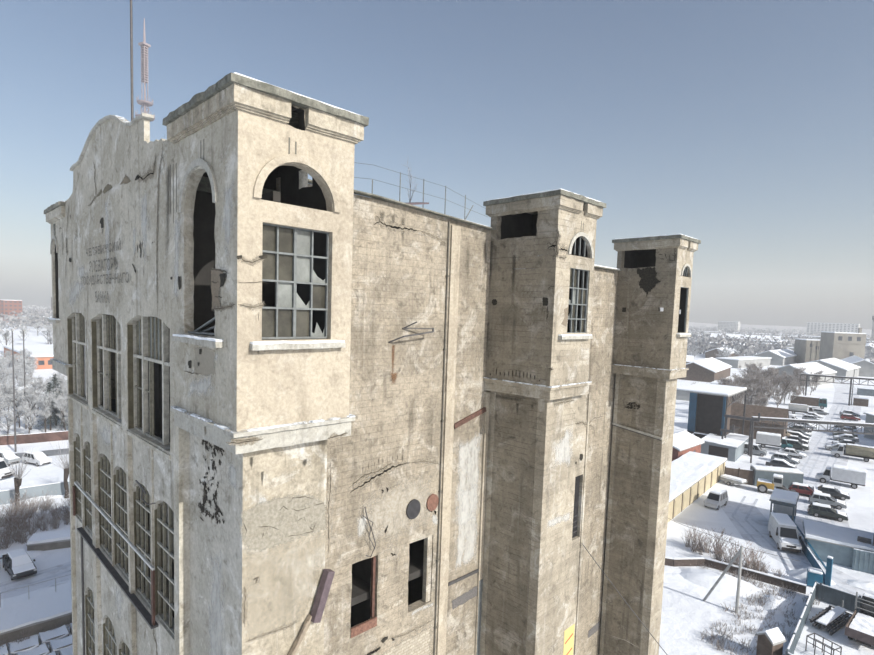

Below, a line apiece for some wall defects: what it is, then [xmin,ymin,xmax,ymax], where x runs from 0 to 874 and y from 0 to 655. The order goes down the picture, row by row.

crack [375,216,446,244]
spalling [211,268,227,310]
peeling [637,250,676,297]
peeling [197,440,225,524]